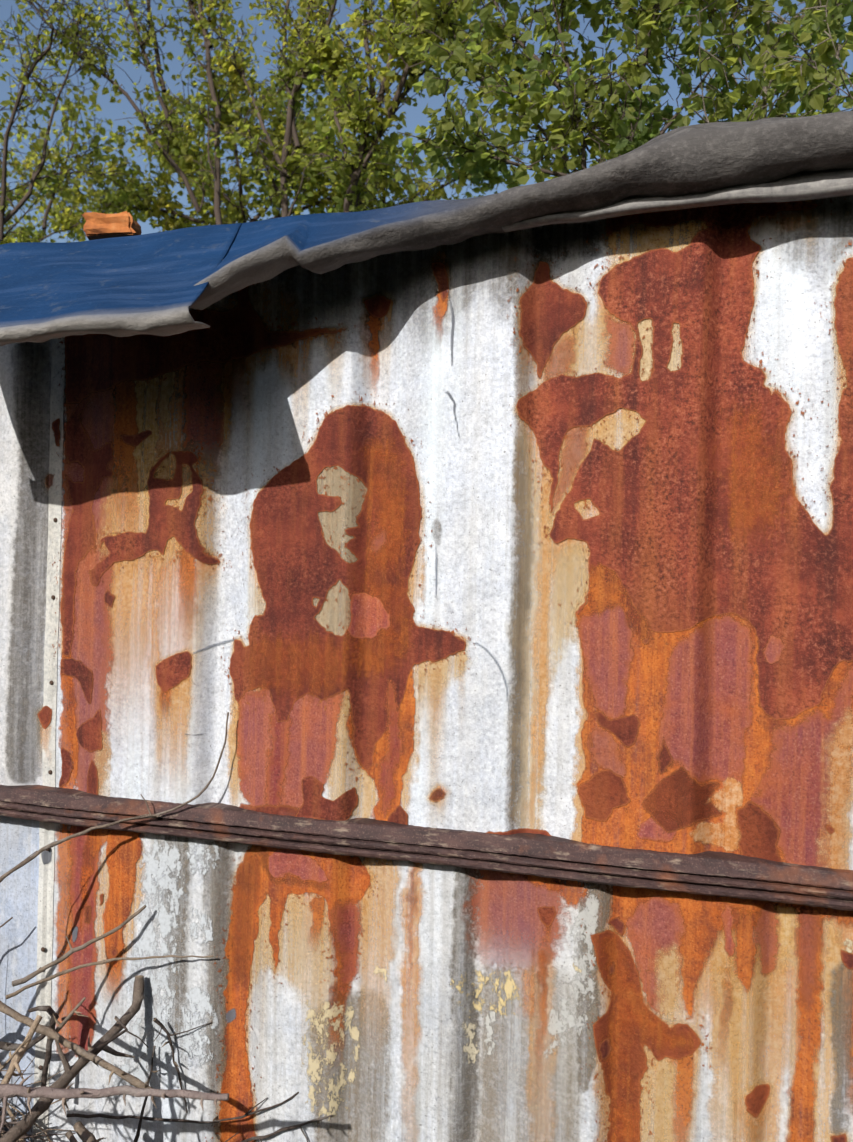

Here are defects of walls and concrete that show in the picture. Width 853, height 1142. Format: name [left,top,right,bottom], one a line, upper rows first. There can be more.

corrosion [432,251,449,323]
damp [6,349,51,782]
corrosion [37,281,476,825]
corrosion [501,198,853,870]
corrosion [41,824,143,1057]
corrosion [204,845,423,1142]
peeling [301,991,388,1142]
corrosion [486,828,551,836]
corrosion [464,869,588,1079]
corrosion [574,886,853,1142]